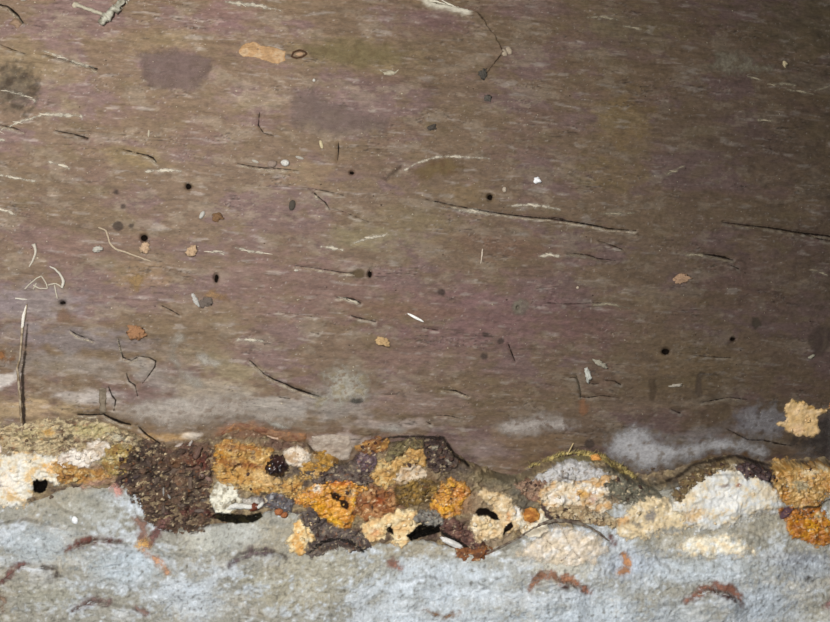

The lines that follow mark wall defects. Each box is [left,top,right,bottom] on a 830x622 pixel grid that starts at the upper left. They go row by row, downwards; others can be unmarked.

crack [434,201,636,262]
crack [725,222,830,241]
peeling [221,423,352,471]
spalling [407,434,461,476]
damp [610,427,765,485]
spalling [31,476,48,493]
spalling [114,438,264,534]
spalling [331,491,349,509]
spalling [735,461,789,491]
spalling [386,520,453,541]
spalling [472,508,513,535]